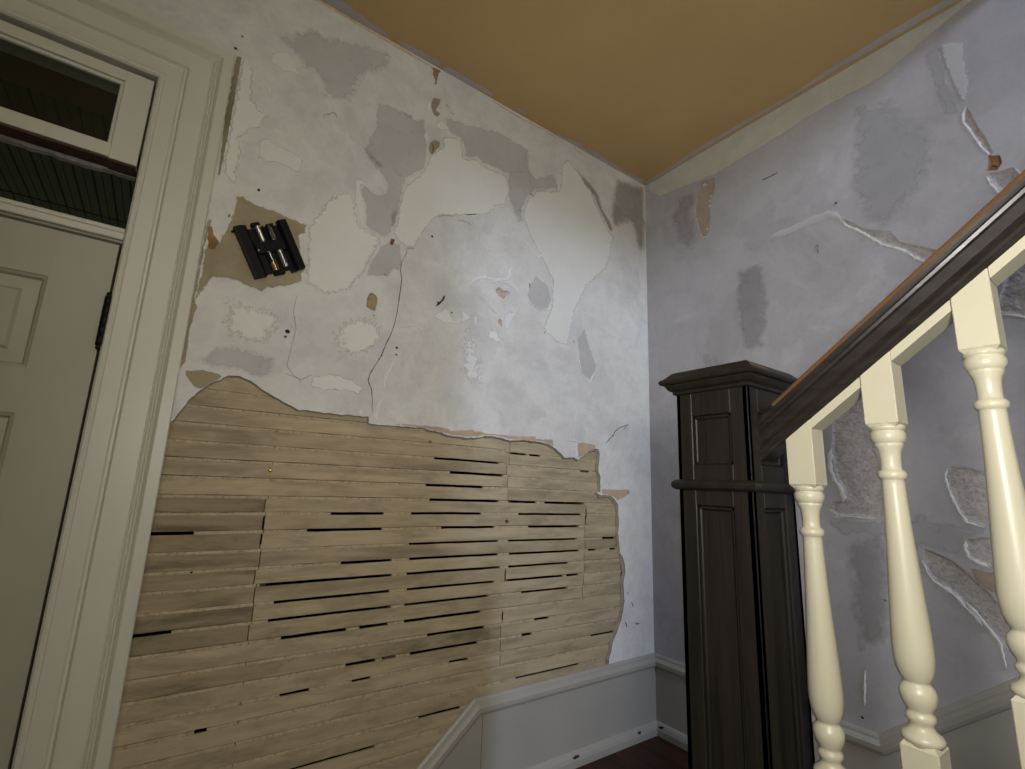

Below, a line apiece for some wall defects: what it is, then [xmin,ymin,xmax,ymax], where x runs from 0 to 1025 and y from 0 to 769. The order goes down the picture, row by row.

flaking render [961,107,1021,193]
flaking render [841,218,937,262]
flaking render [999,264,1025,319]
flaking render [827,399,884,519]
flaking render [170,376,630,665]
flaking render [921,466,1011,669]